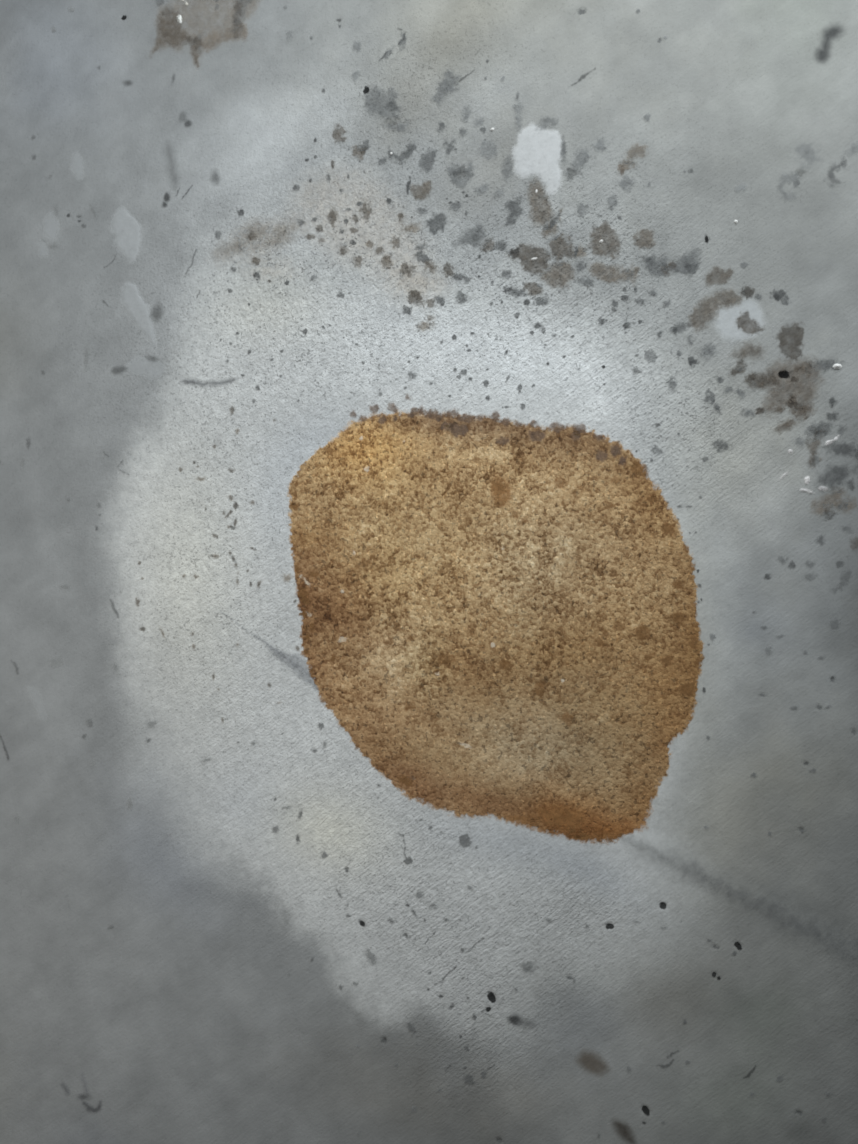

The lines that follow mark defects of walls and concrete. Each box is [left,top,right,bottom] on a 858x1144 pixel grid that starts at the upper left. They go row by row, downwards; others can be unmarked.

damp [159,3,201,63]
damp [608,144,645,209]
damp [461,184,624,305]
corrosion [288,396,704,842]